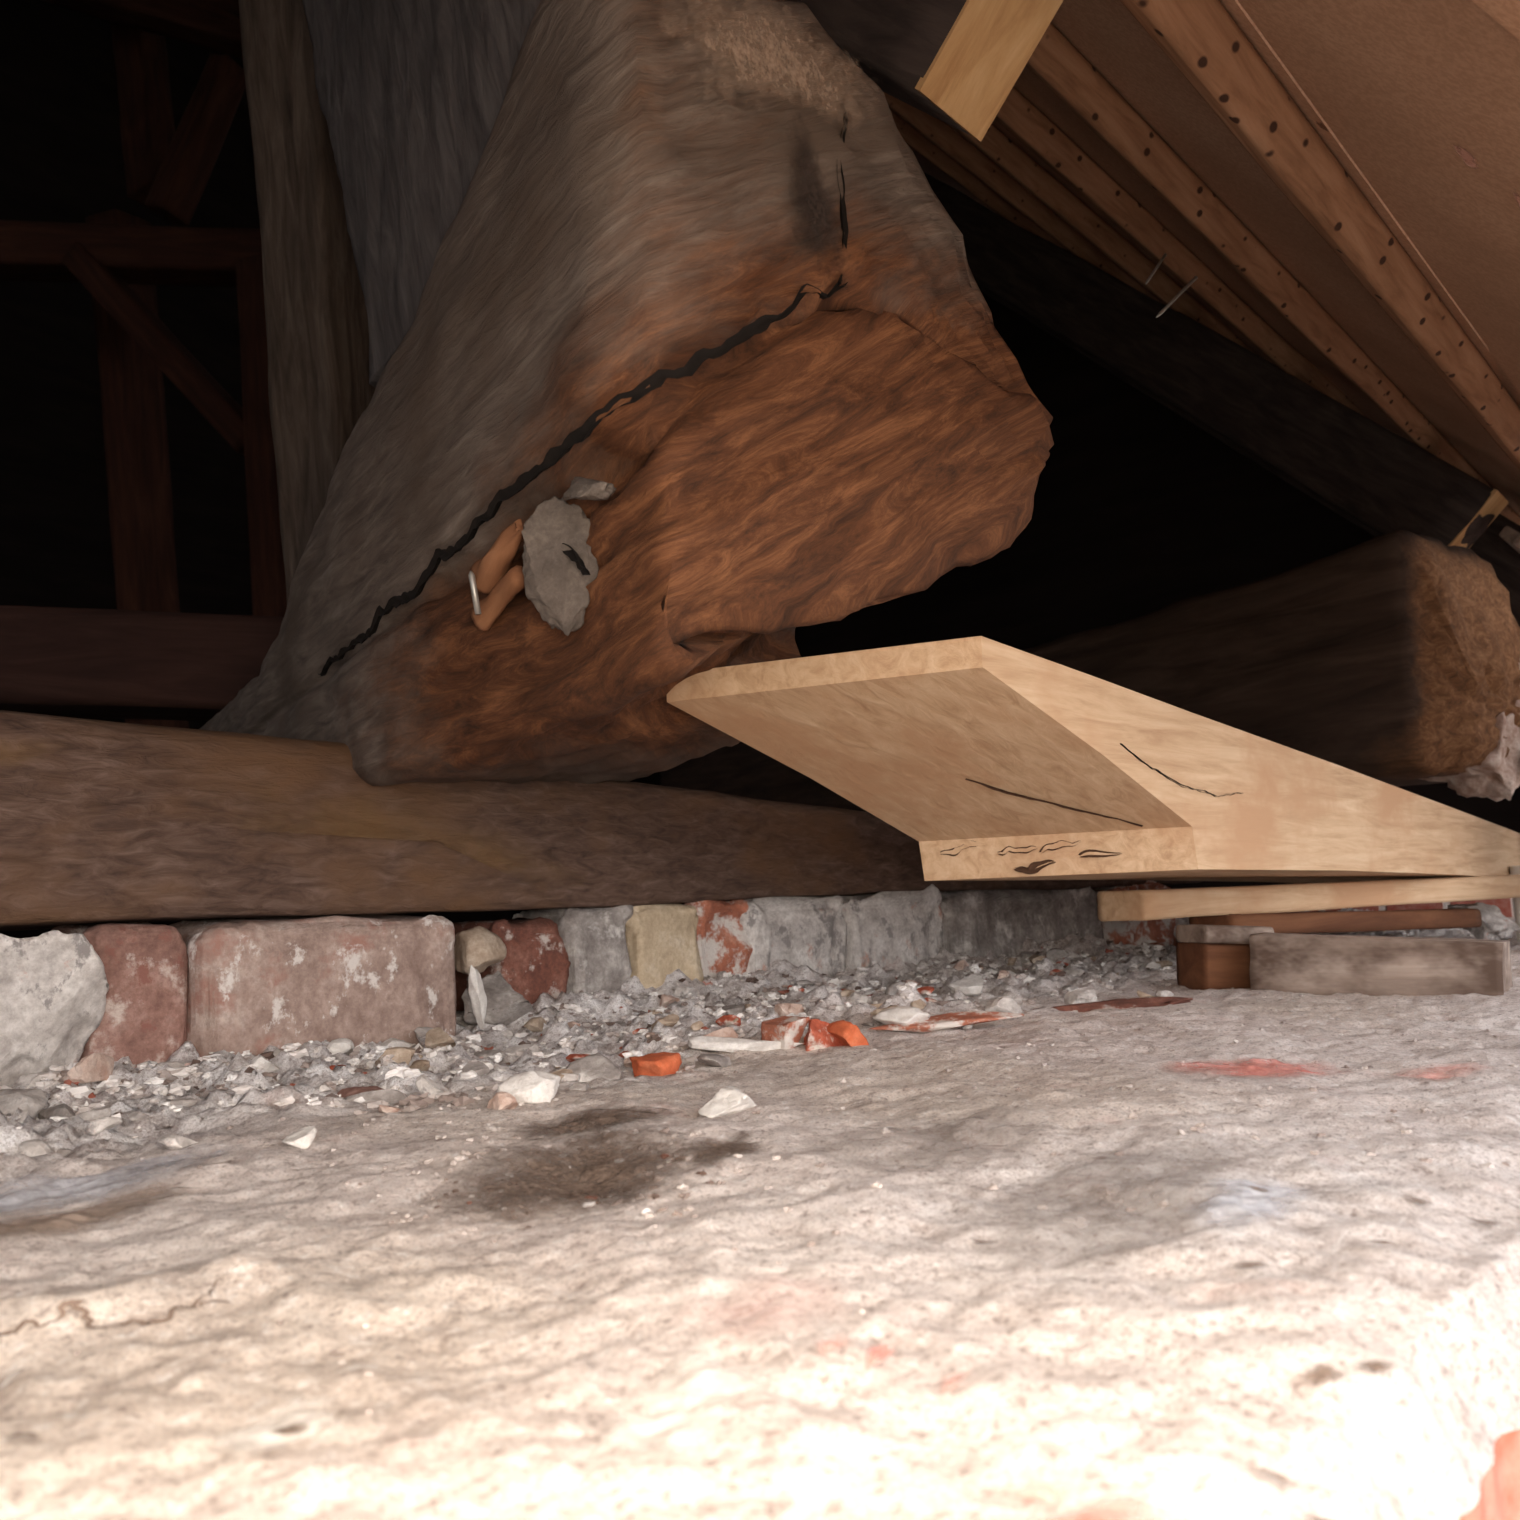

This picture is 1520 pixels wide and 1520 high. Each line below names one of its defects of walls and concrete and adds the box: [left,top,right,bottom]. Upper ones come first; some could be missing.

damp [446,1106,758,1223]
crack [0,1273,232,1336]